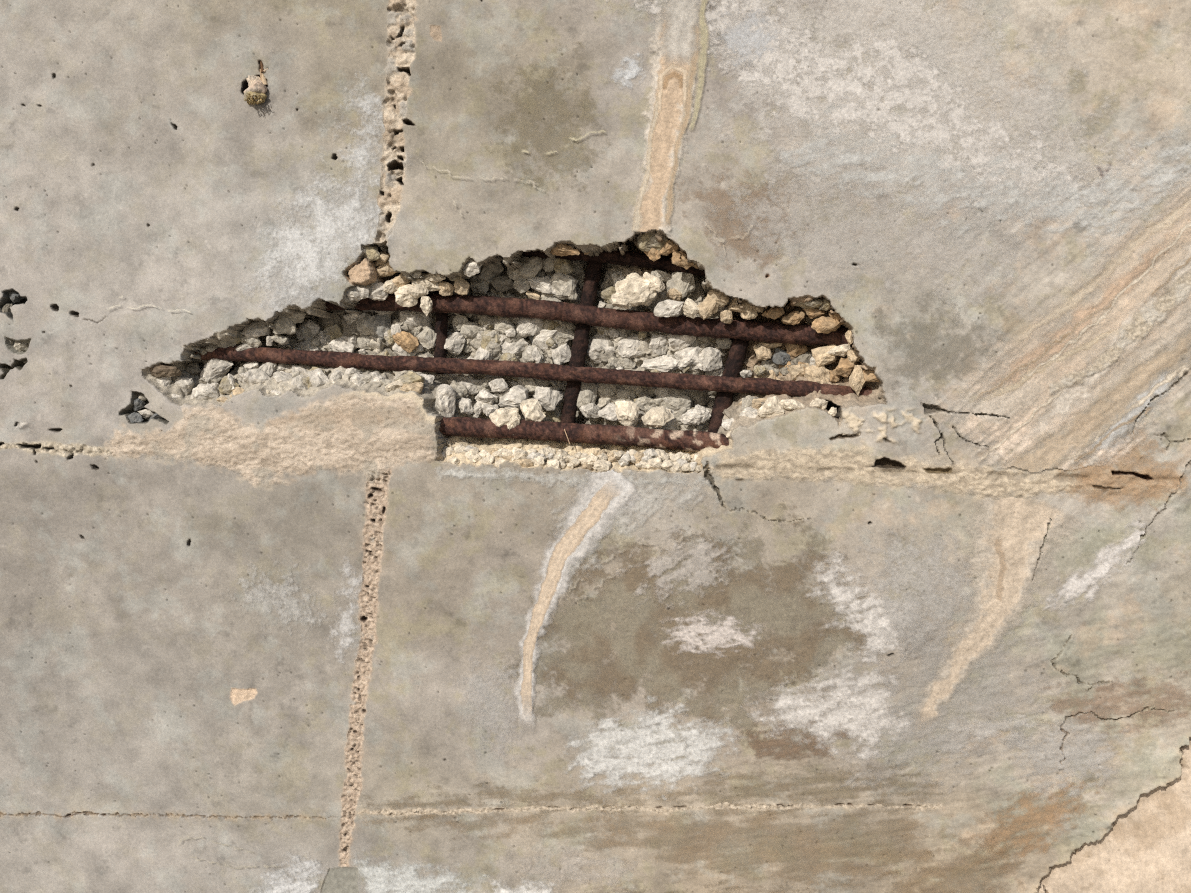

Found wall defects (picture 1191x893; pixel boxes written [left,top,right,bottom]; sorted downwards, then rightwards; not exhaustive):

water stain [613,0,1191,472]
spalling [141,229,888,474]
crack [920,403,1009,466]
crack [1125,366,1191,565]
water stain [442,468,1190,808]
crack [1050,635,1175,764]
crack [0,811,338,821]
water stain [354,860,472,893]
water stain [492,850,635,893]